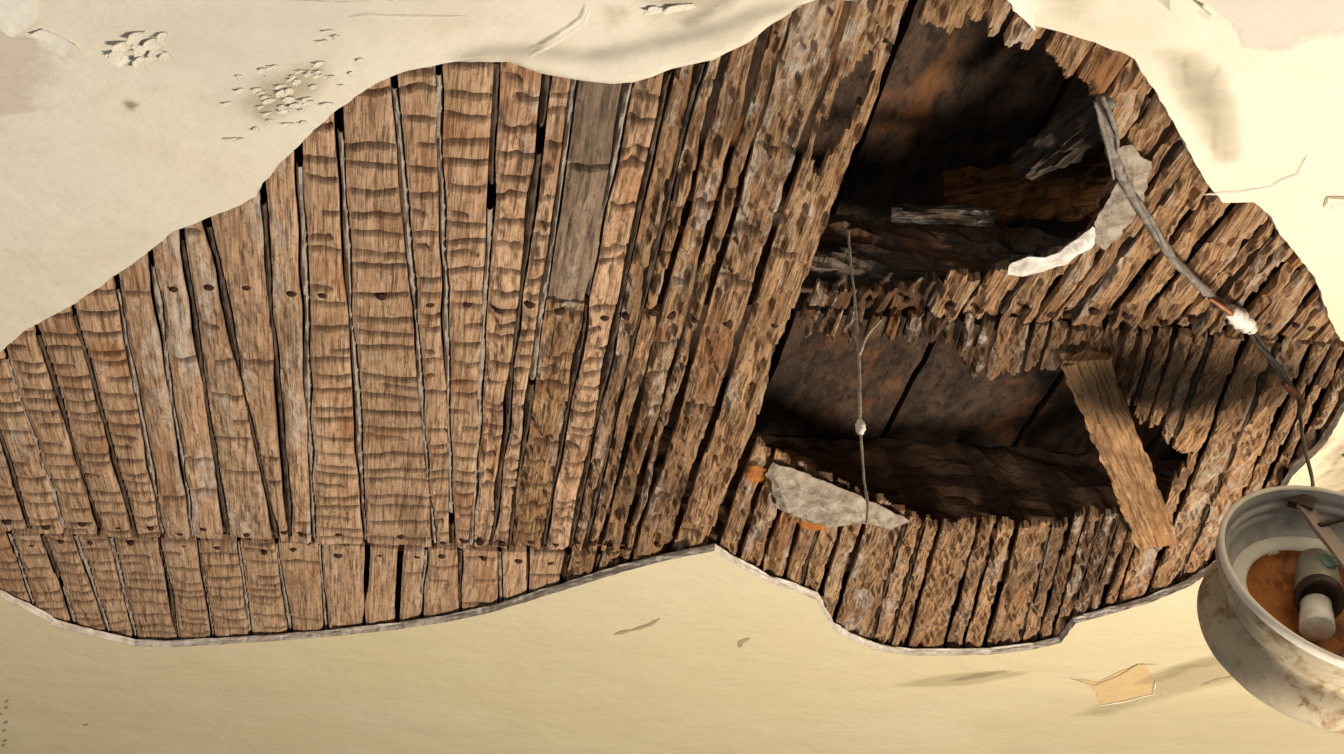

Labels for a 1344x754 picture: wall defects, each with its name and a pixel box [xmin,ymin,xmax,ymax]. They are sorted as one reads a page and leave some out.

peeling [0,0,79,116]
peeling [222,58,366,143]
flaking render [1008,0,1036,31]
peeling [1158,0,1344,51]
flaking render [1281,402,1344,486]
flaking render [0,544,1216,655]